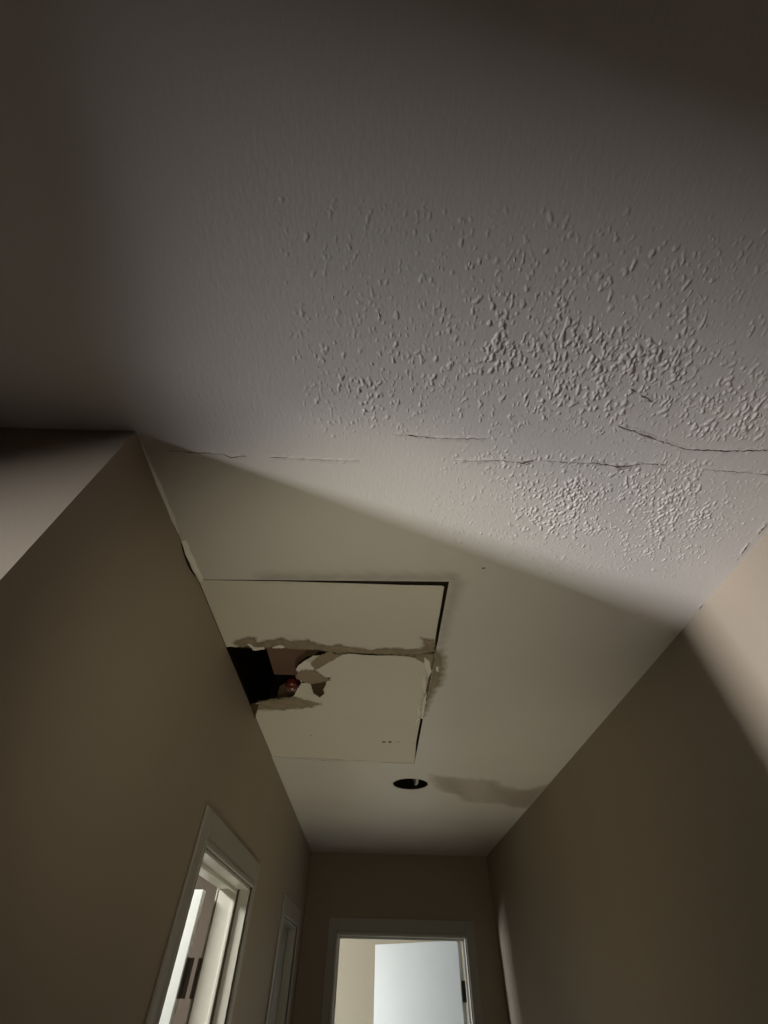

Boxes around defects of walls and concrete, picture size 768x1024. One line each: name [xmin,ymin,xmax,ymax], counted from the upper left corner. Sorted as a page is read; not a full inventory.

crack [169,448,359,464]
crack [392,423,768,478]
peeling [311,677,331,697]